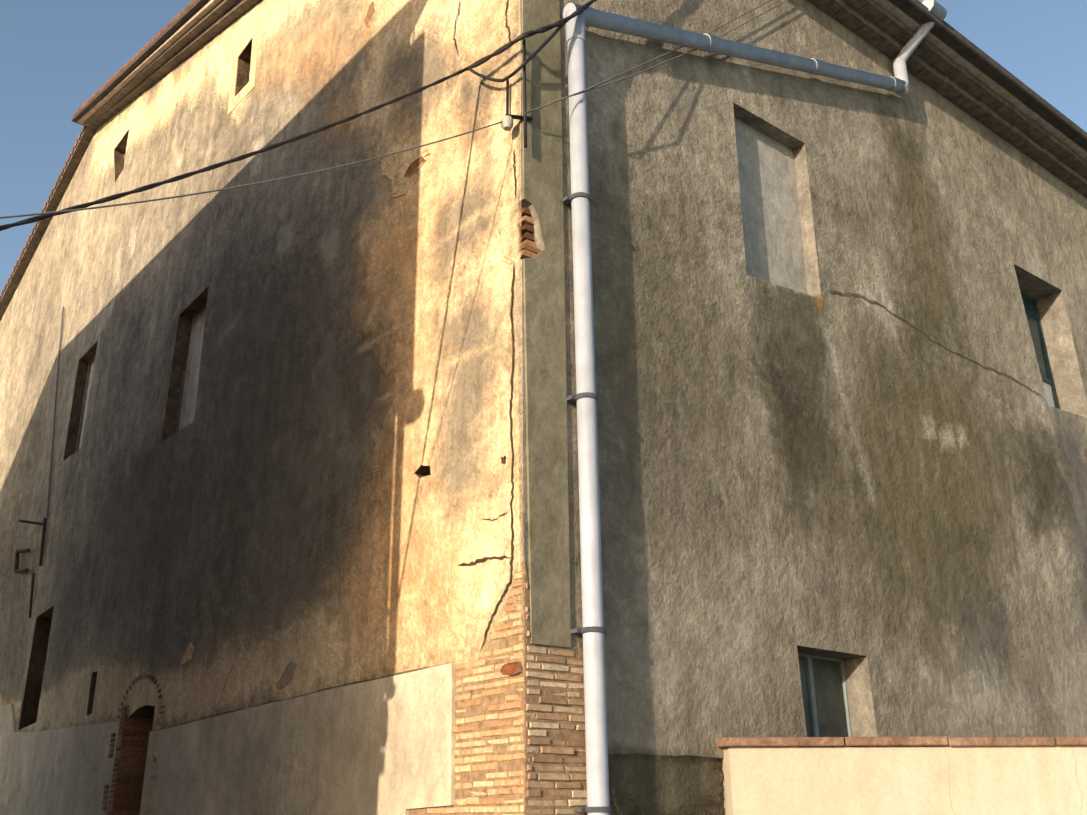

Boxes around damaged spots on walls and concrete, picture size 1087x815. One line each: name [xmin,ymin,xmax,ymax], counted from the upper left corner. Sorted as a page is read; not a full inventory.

crack [503,0,511,51]
leakage [437,184,492,281]
crack [510,152,518,198]
leakage [101,249,377,639]
peeling [0,0,542,732]
leakage [441,294,497,502]
leakage [628,419,677,524]
leakage [752,278,833,505]
crack [825,290,1042,396]
leakage [1023,417,1087,603]
leakage [0,537,21,663]